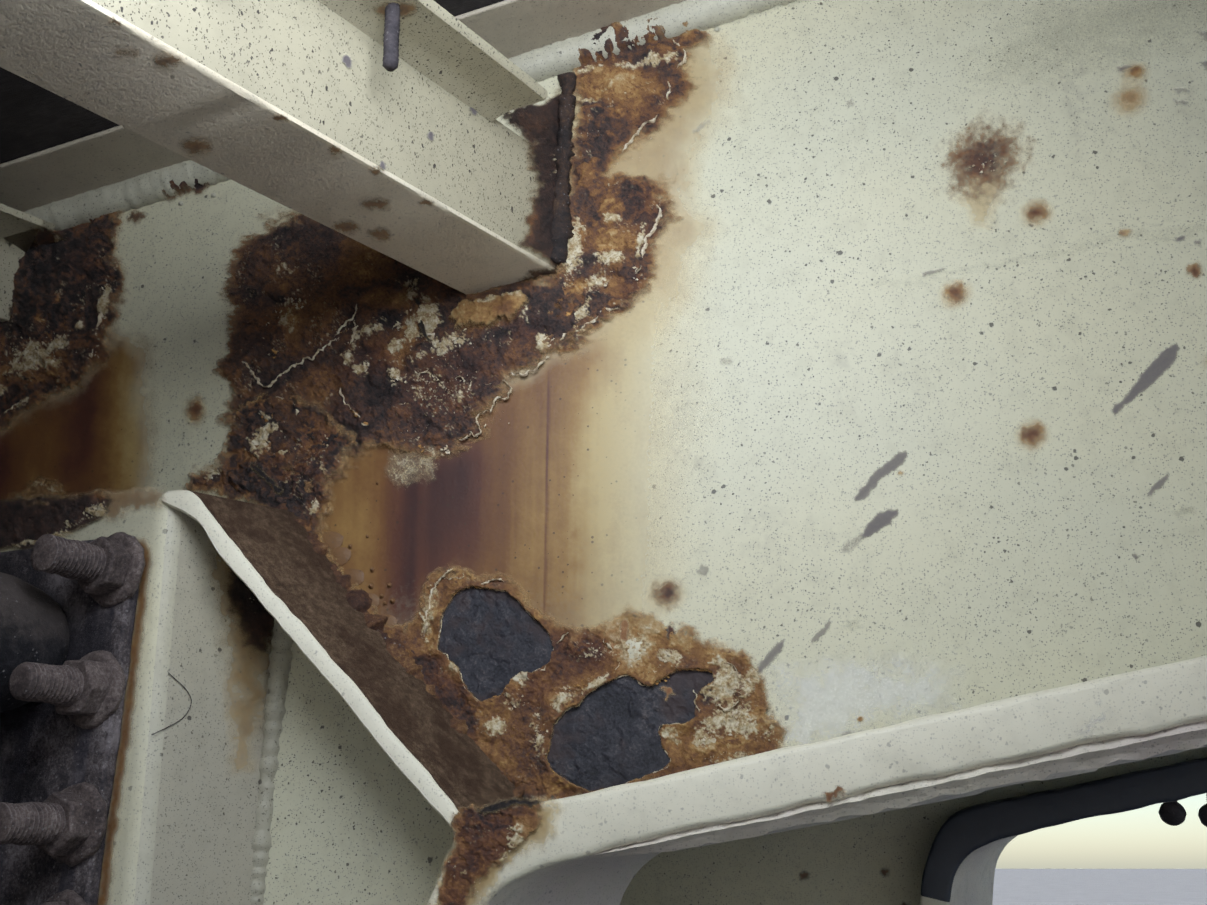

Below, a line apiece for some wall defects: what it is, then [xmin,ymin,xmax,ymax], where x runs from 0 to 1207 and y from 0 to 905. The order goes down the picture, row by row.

rust [154,56,181,67]
rust [162,179,210,199]
rust [942,122,1022,218]
rust [1026,203,1048,221]
rust [945,283,964,302]
rust [0,210,162,549]
rust [183,18,786,905]
rust [1020,423,1044,445]
peeling [437,586,554,701]
rust [97,539,151,905]
peeling [546,669,714,792]